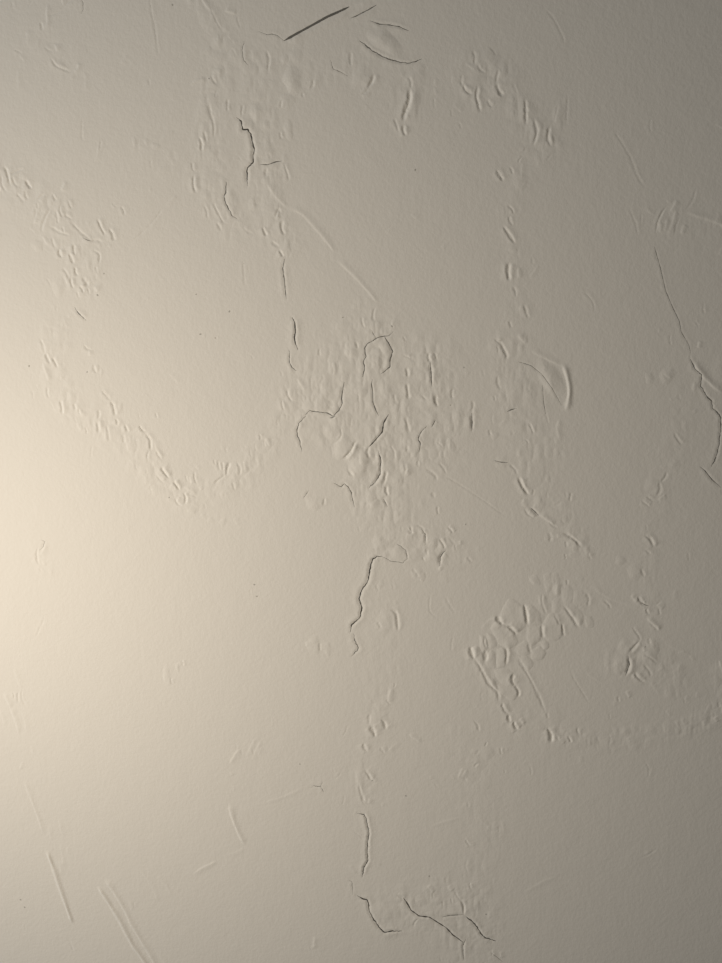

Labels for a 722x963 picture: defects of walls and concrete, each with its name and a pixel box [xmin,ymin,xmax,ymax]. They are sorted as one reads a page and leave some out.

crack [216,109,263,223]
crack [343,549,388,660]
crack [349,807,504,963]